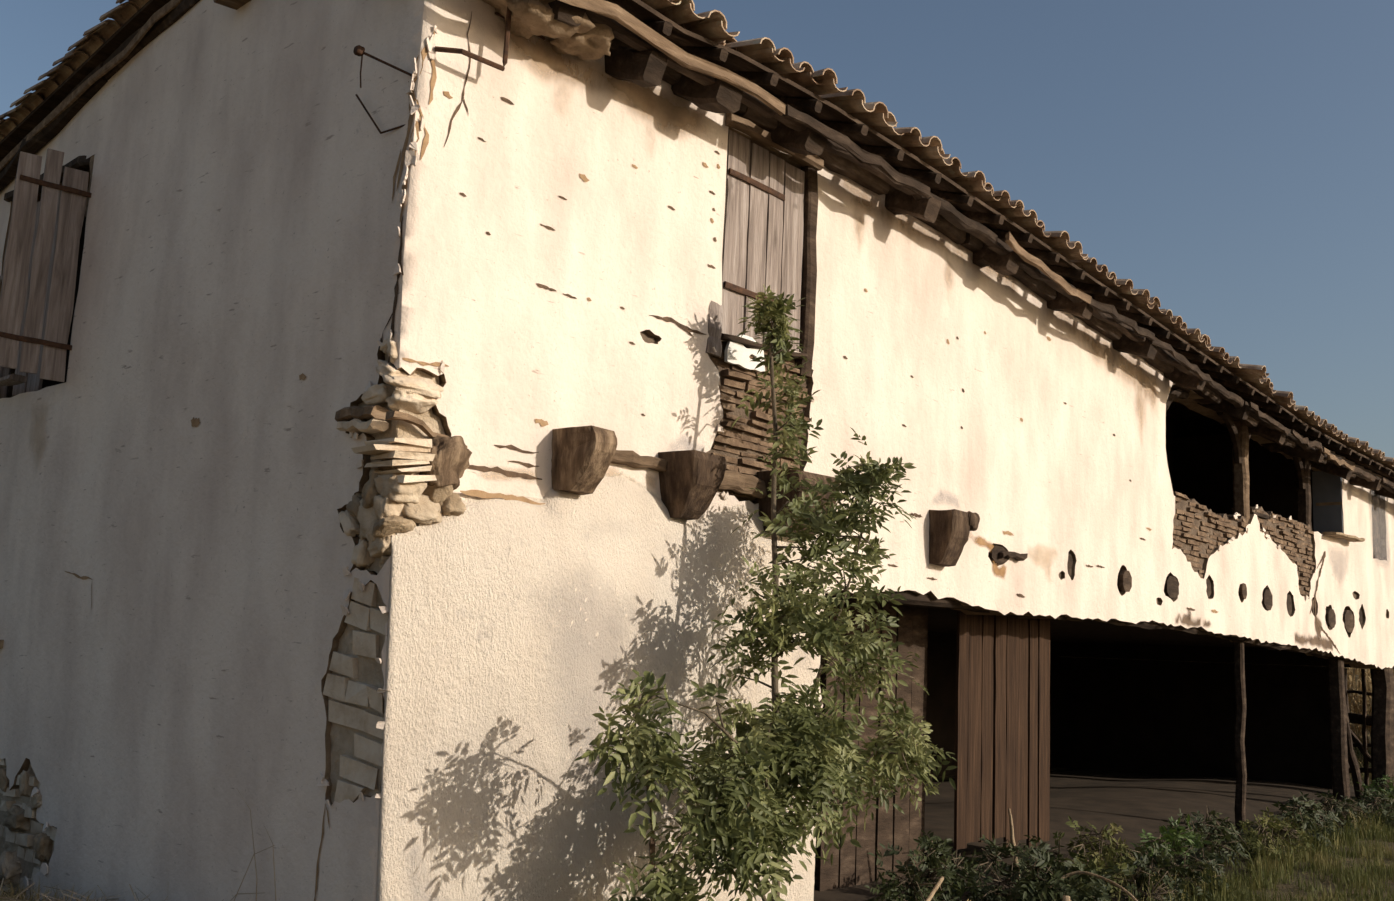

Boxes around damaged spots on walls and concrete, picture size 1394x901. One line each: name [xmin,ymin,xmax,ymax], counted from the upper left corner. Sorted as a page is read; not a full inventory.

spalling [317,336,472,808]
spalling [1172,491,1315,600]
spalling [0,759,57,894]
crack [314,804,330,901]